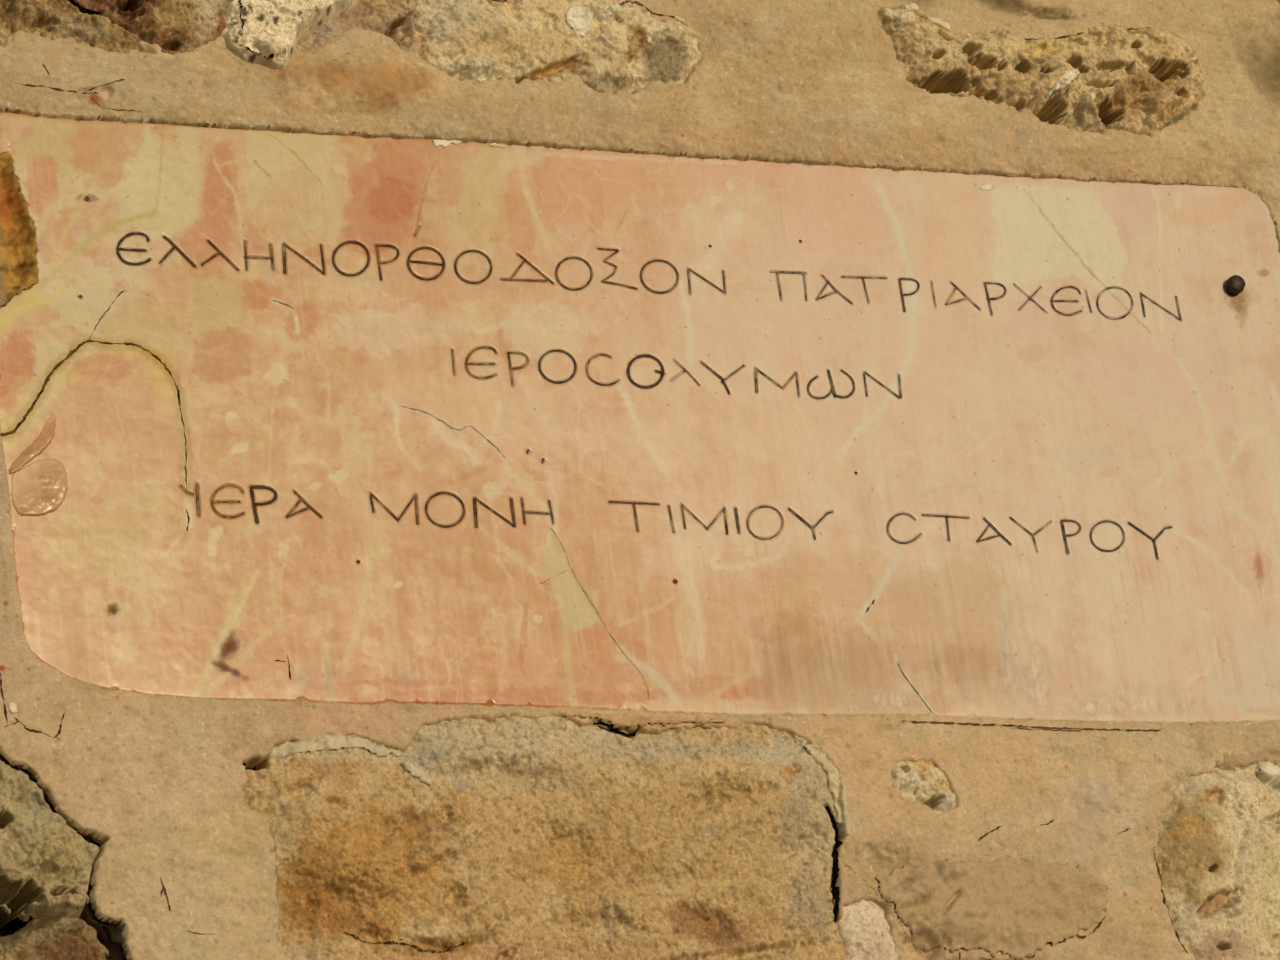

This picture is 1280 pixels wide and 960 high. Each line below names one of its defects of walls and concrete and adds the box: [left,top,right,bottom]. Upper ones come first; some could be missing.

crack [0,290,190,531]
crack [401,406,505,458]
crack [540,528,710,737]
crack [0,673,127,960]
crack [824,805,915,945]
spalling [1214,750,1280,792]